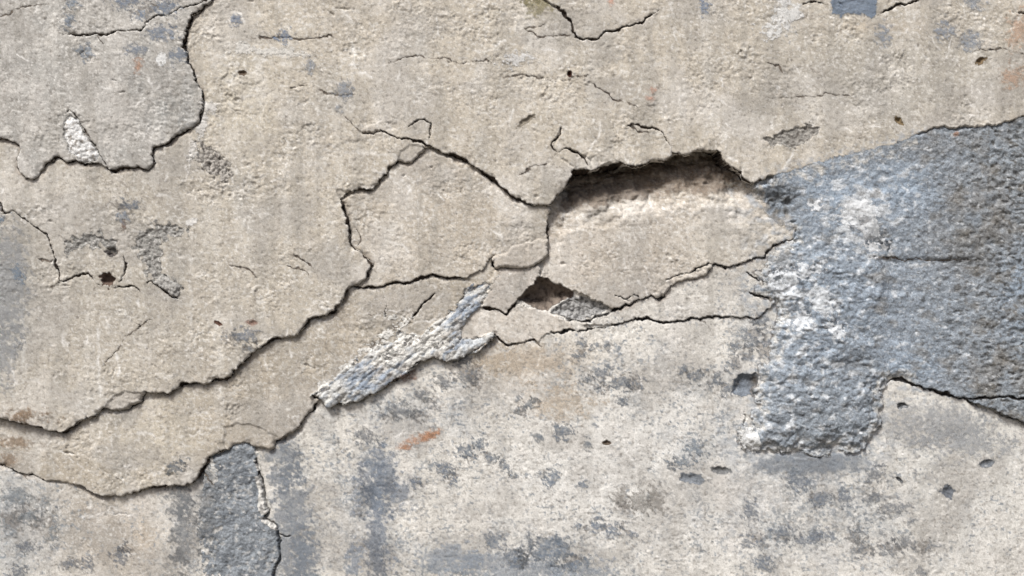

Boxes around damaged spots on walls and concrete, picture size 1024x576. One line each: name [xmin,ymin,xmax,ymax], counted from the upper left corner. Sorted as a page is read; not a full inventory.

crack [0,0,213,180]
peeling [0,0,234,184]
crack [524,6,658,41]
spalling [763,121,820,151]
crack [0,202,178,299]
crack [130,55,762,409]
spalling [518,152,792,321]
spalling [0,258,501,552]
crack [276,240,787,443]
crack [886,376,1024,423]
peeling [58,550,94,573]
peeling [107,540,132,569]